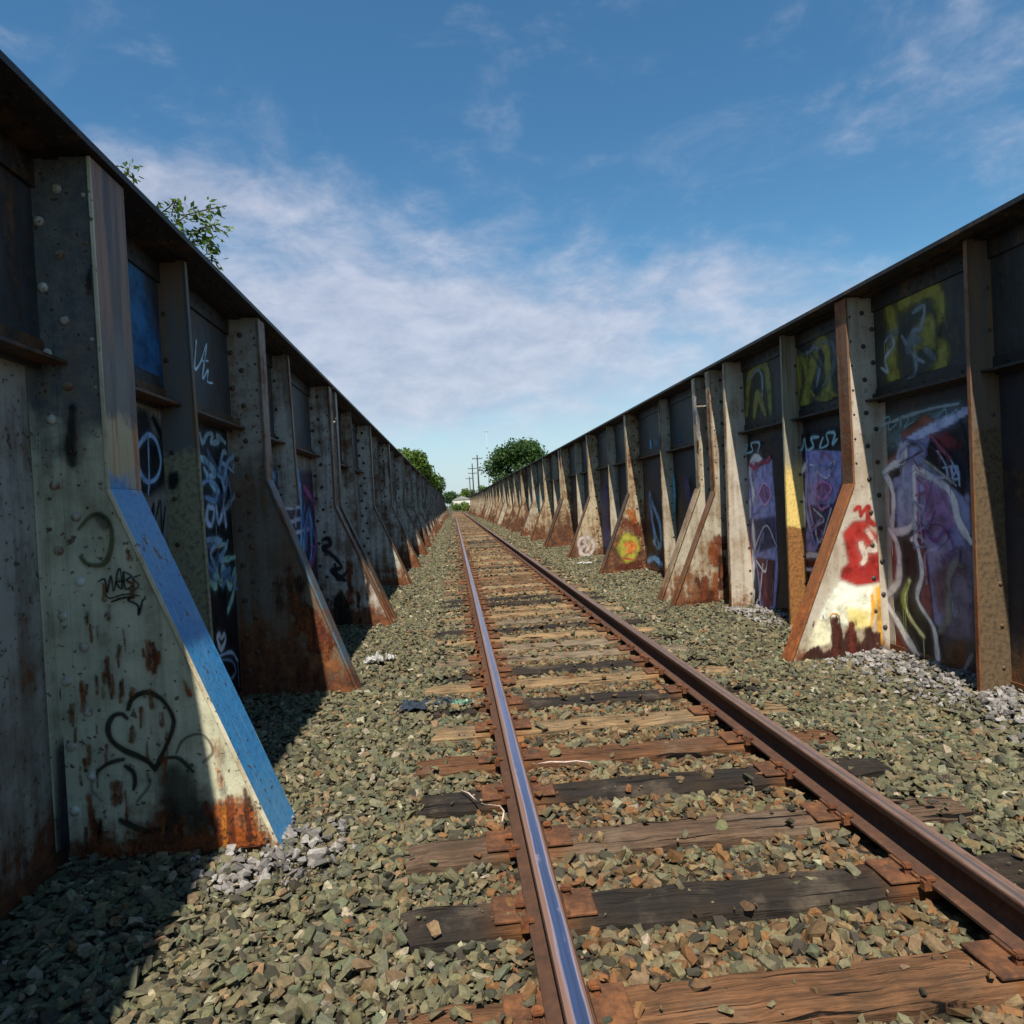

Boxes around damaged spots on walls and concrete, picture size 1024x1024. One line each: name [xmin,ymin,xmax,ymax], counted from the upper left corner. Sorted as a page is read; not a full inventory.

rust [622,509,641,536]
rust [346,560,370,607]
rust [616,560,643,570]
rust [686,534,728,603]
rust [272,566,335,693]
rust [69,629,266,861]